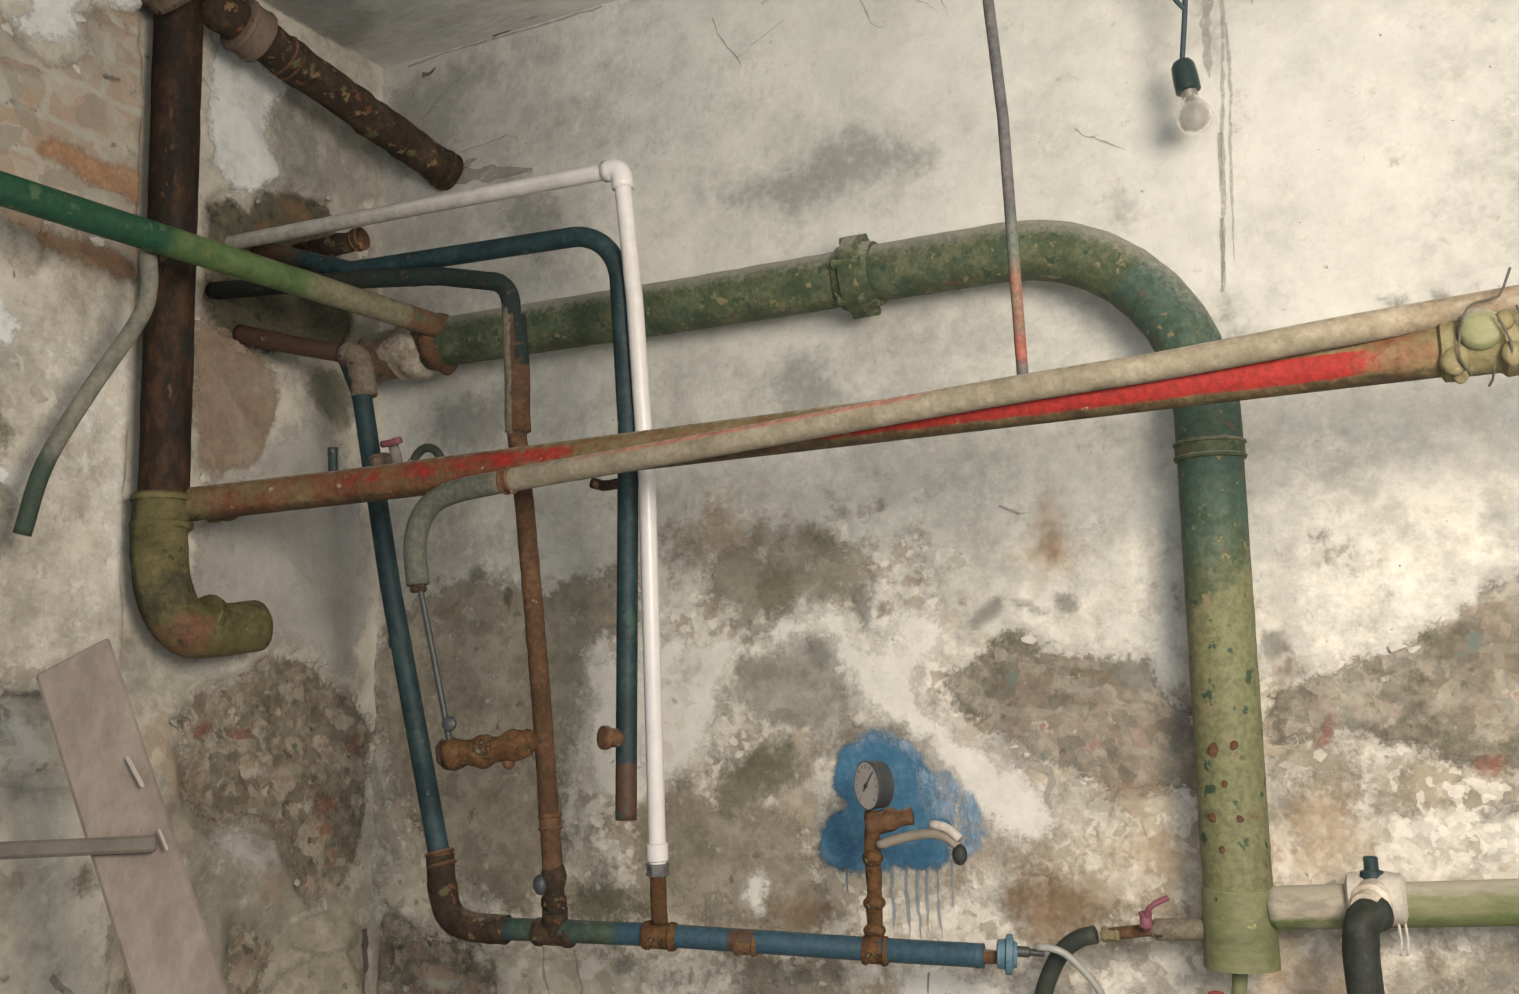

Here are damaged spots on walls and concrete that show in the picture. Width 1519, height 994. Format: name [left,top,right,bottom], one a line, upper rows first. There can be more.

spalling [0,4,145,215]
spalling [0,207,138,281]
spalling [169,628,422,905]
flaking render [406,577,542,914]
flaking render [542,565,617,858]
water stain [586,657,616,804]
water stain [637,527,1053,844]
spalling [1262,575,1519,777]
spalling [375,911,683,994]